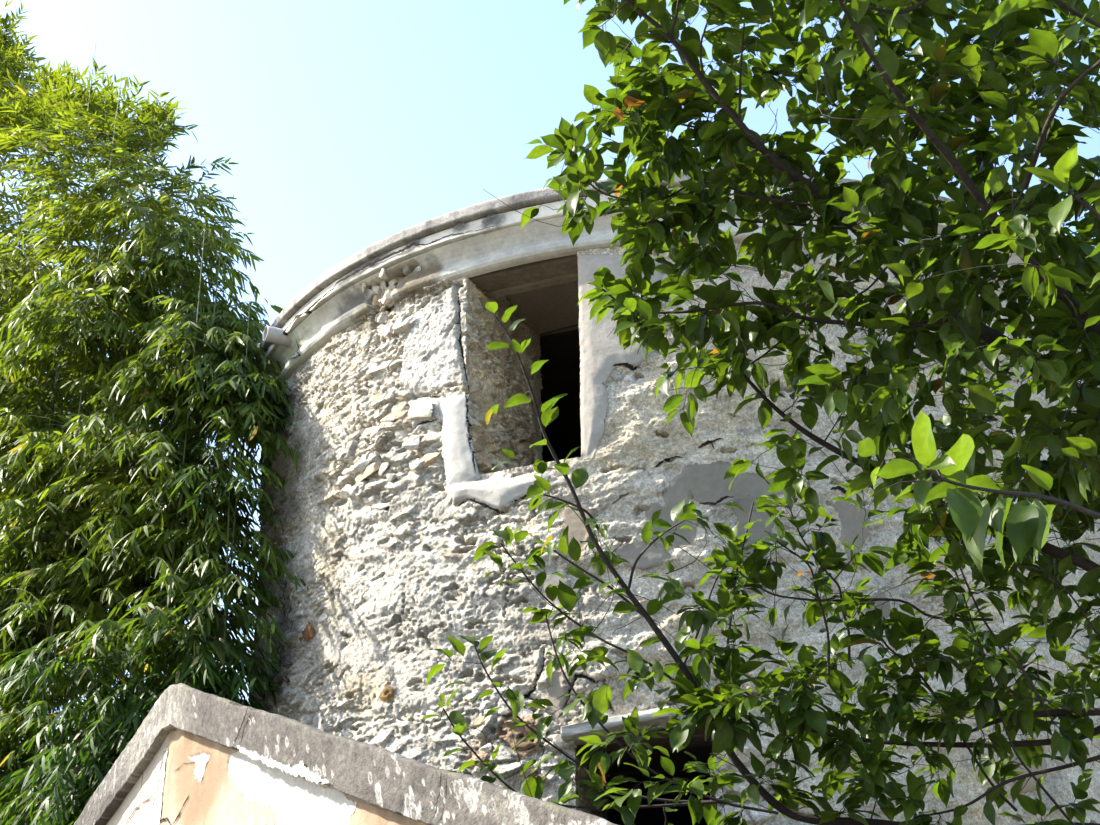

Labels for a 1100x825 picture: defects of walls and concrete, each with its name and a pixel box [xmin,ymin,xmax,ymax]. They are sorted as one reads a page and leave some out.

crack [125,796,189,824]
peeling [149,748,168,825]
peeling [227,751,357,825]